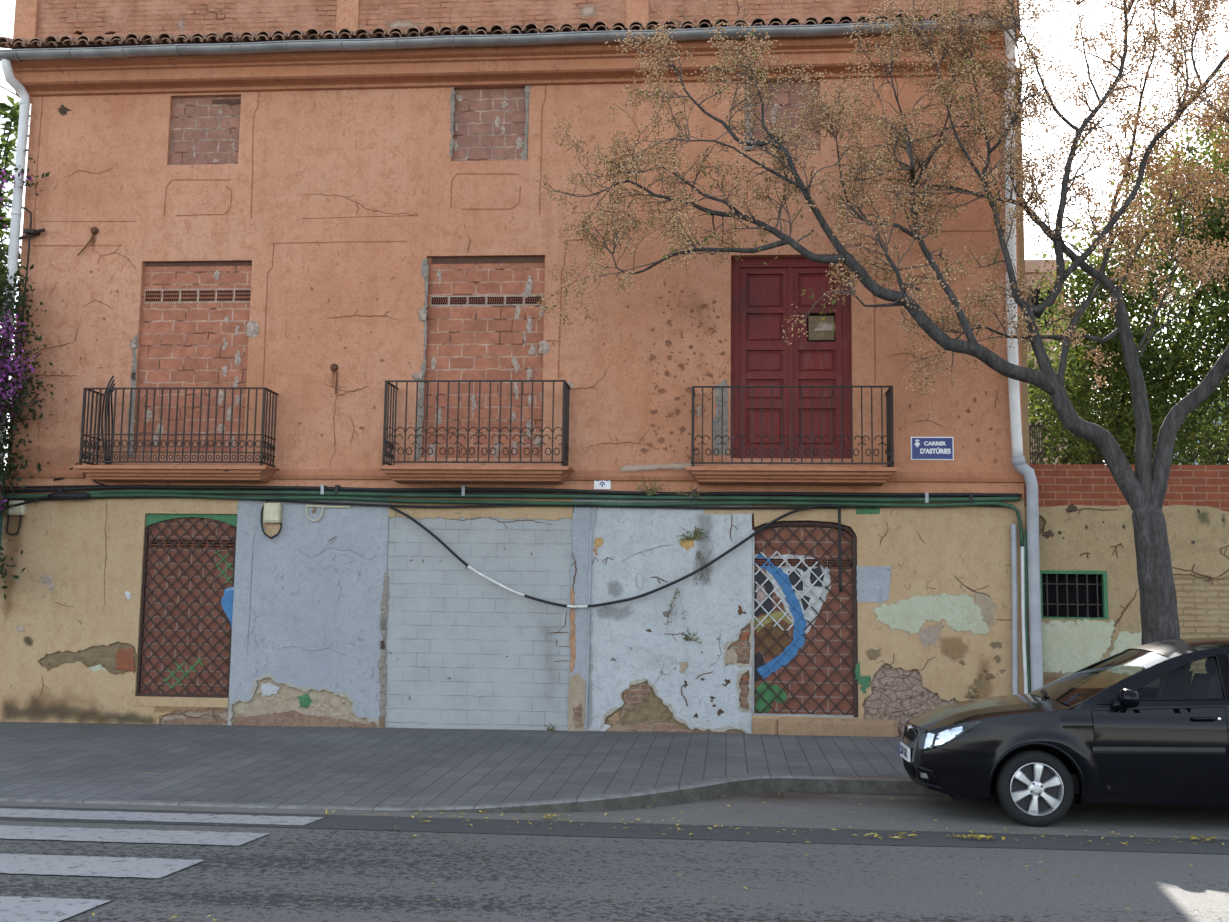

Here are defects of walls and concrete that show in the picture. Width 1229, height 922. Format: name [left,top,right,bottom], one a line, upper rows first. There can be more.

crack [306,194,414,215]
crack [324,381,368,465]
flaking render [1173,574,1229,639]
flaking render [38,642,137,675]
flaking render [160,572,398,728]
flaking render [568,586,754,734]
flaking render [854,592,1006,736]
flaking render [1189,658,1207,682]